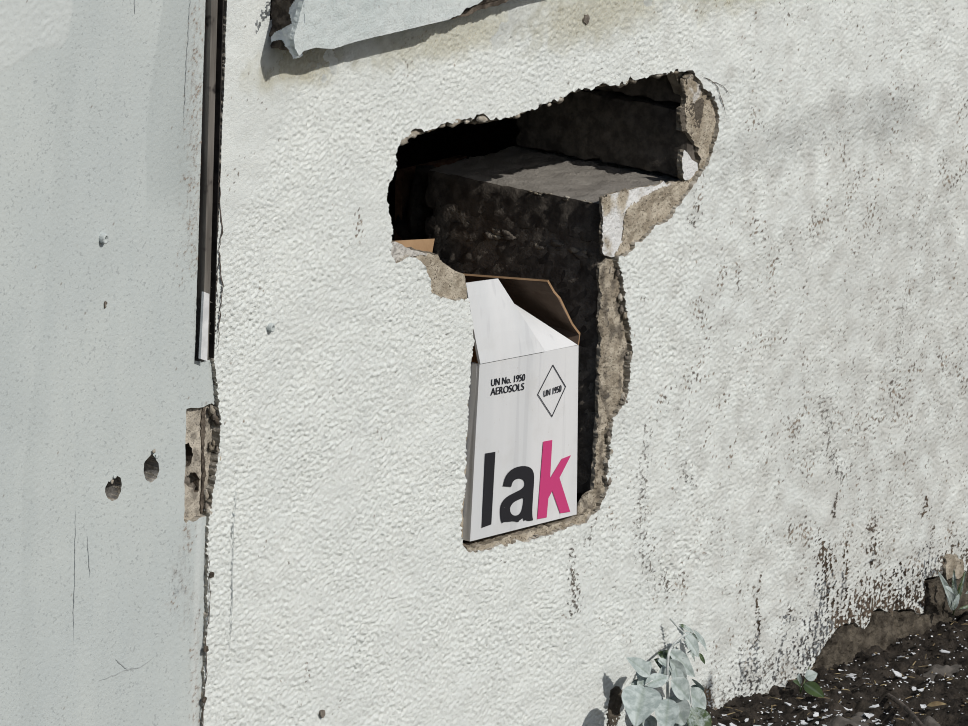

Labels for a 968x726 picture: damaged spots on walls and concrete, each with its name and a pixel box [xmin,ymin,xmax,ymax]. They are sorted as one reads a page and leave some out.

spalling [269,0,305,59]
spalling [451,0,509,19]
spalling [399,114,488,146]
spalling [390,240,467,300]
spalling [462,70,716,551]
spalling [184,404,226,520]
water stain [633,424,675,599]
water stain [803,530,850,659]
peeling [810,554,968,670]